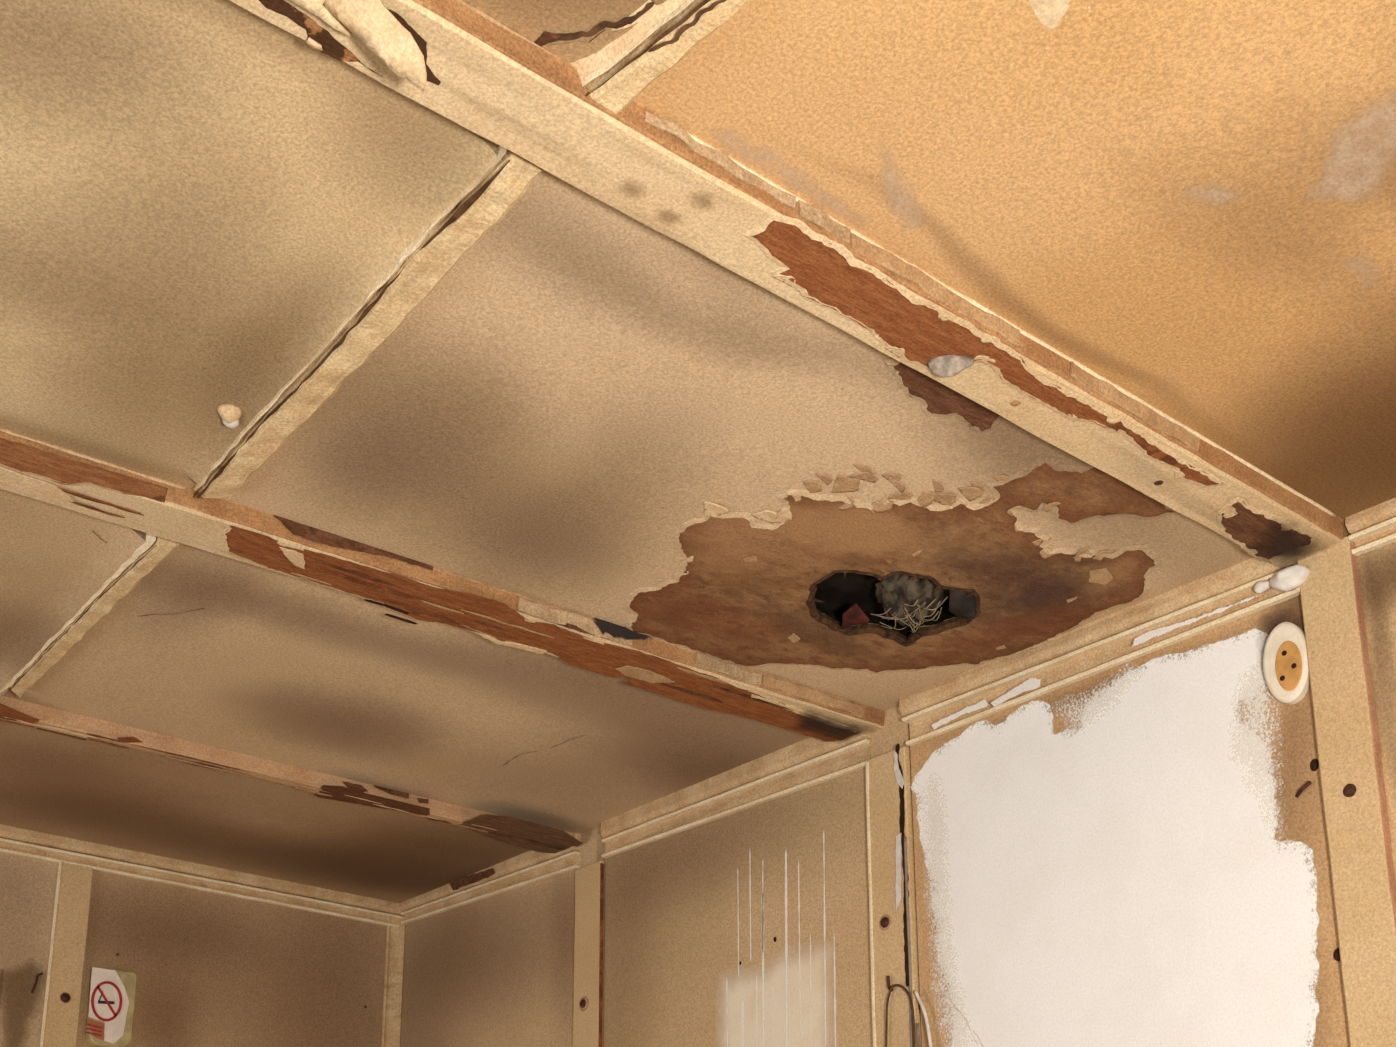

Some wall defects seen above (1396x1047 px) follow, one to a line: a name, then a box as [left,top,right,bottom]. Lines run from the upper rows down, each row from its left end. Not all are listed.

crack [196,160,510,499]
peeling [742,213,1317,561]
peeling [0,703,90,740]
peeling [314,781,430,816]
peeling [457,814,582,854]
peeling [220,456,1178,742]